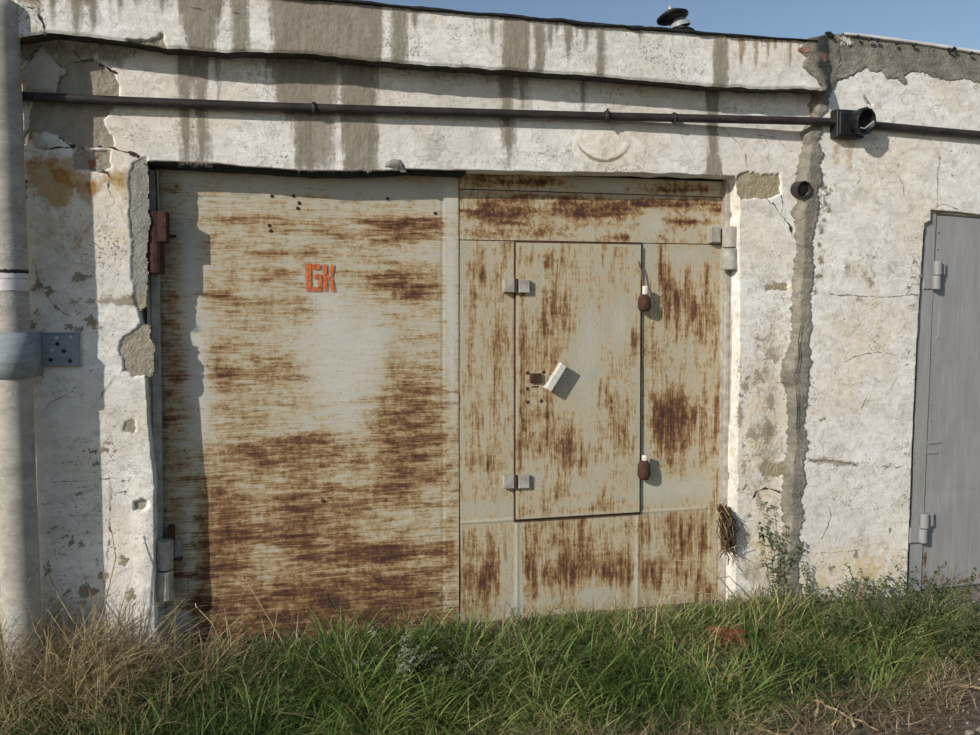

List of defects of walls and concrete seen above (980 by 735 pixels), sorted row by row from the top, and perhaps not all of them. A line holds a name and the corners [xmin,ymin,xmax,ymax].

damp [70,0,97,32]
spalling [24,61,119,173]
damp [177,0,250,165]
damp [266,0,417,172]
damp [489,16,605,166]
damp [705,35,776,176]
peeling [32,277,56,297]
spalling [64,157,151,332]
spalling [736,172,780,200]
crack [767,195,792,234]
spalling [119,323,155,377]
crack [794,326,802,430]